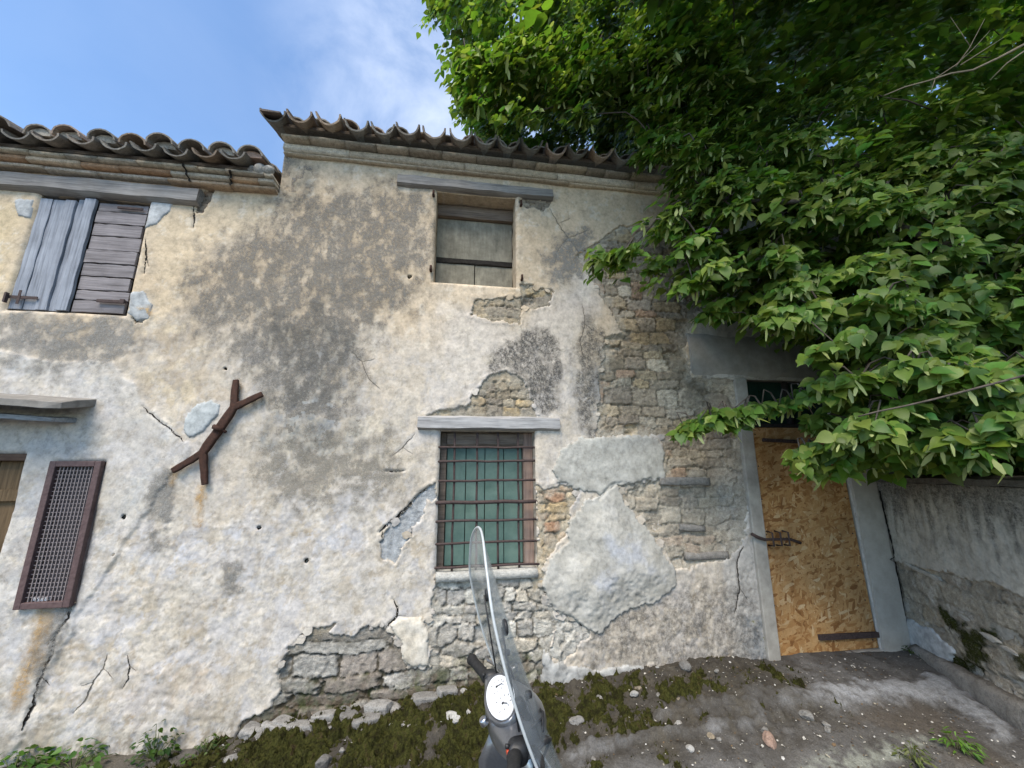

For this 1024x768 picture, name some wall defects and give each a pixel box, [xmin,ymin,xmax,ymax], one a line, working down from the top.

crack [144,407,183,441]
water stain [181,156,435,512]
spalling [420,371,540,417]
spalling [471,284,554,325]
water stain [489,329,561,414]
spalling [576,226,748,570]
spalling [237,483,590,735]
crack [735,546,748,611]
crack [21,601,75,731]
crack [76,655,136,709]